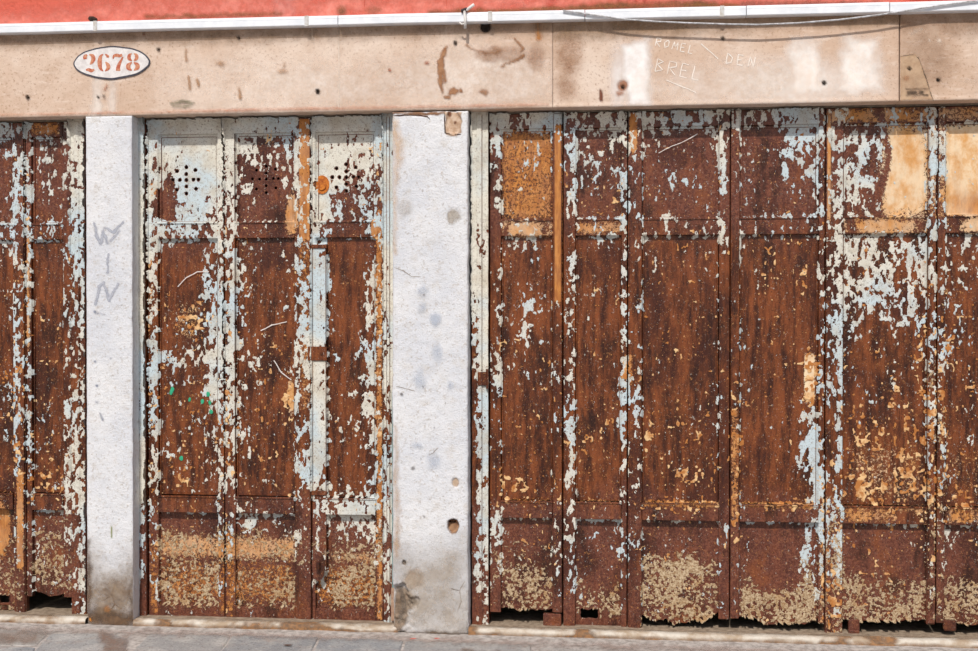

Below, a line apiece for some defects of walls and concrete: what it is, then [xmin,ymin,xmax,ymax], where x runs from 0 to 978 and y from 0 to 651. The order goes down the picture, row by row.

peeling [437,46,462,99]
corrosion [0,203,64,570]
corrosion [148,286,217,351]
corrosion [148,368,358,632]
corrosion [242,108,327,515]
corrosion [315,169,383,620]
corrosion [490,449,567,561]
corrosion [491,122,571,306]
peeling [138,90,978,632]
corrosion [564,404,618,474]
corrosion [576,178,624,237]
corrosion [629,289,978,646]